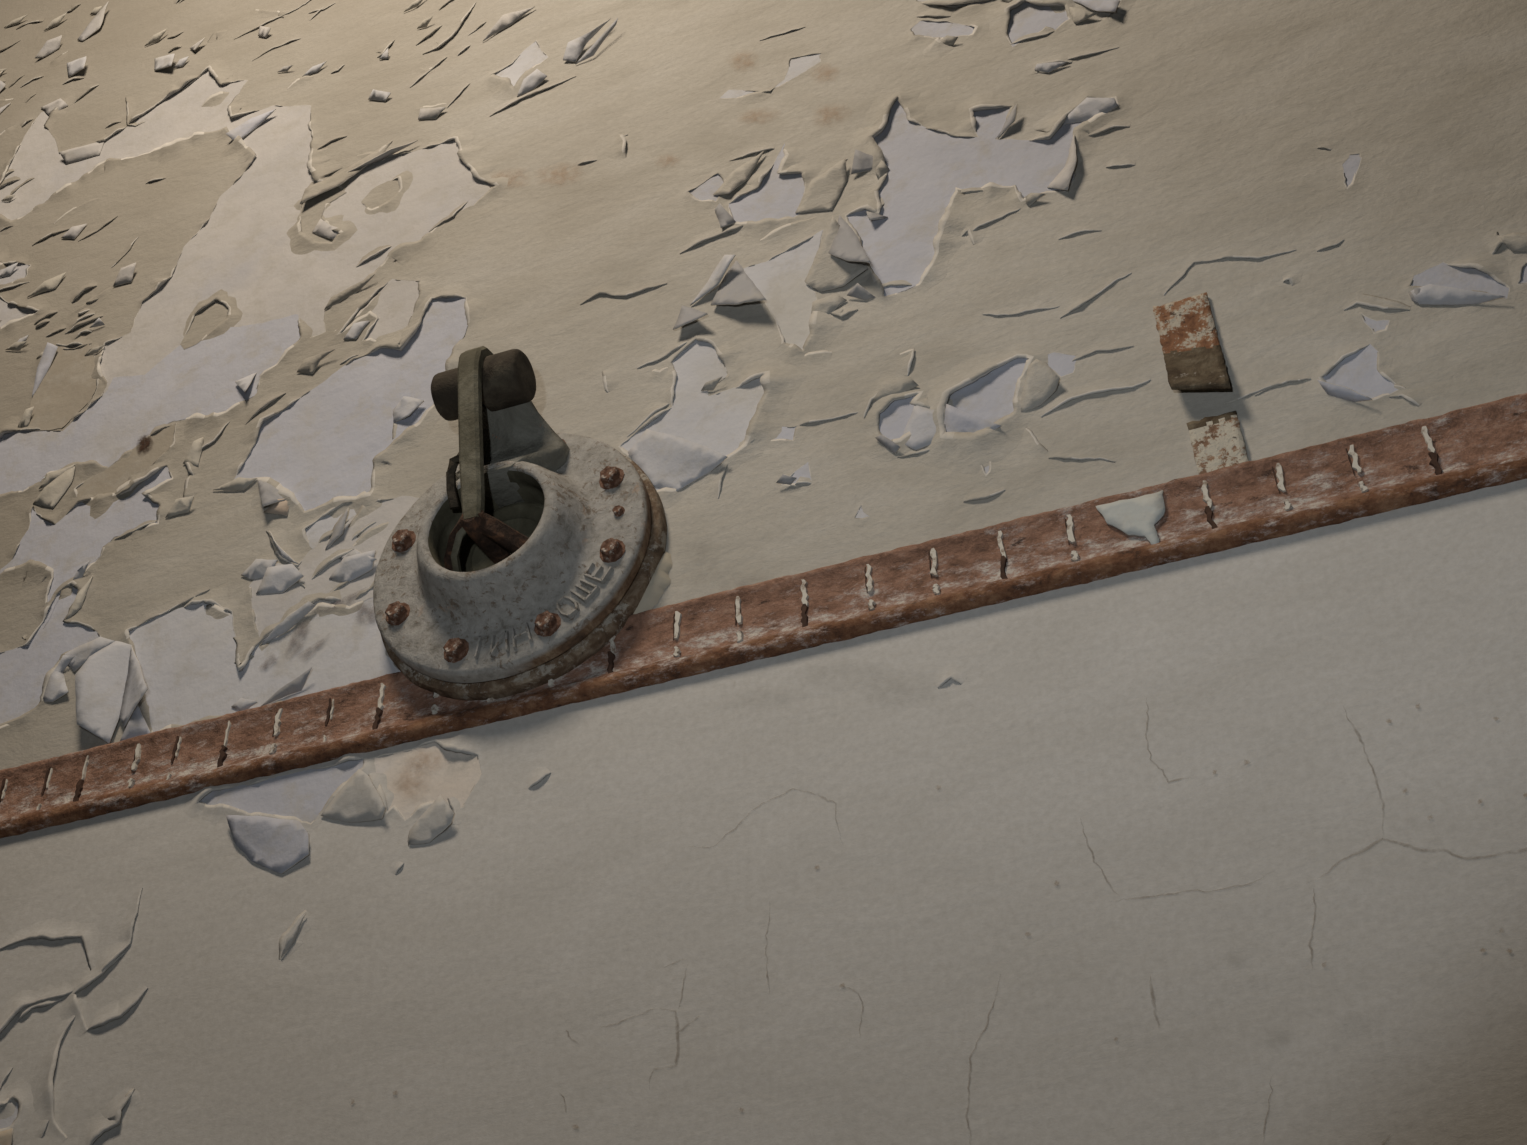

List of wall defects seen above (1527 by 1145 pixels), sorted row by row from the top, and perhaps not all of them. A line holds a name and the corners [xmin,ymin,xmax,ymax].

peeling [414,18,618,120]
peeling [903,0,1136,75]
peeling [0,0,535,744]
peeling [612,84,1151,508]
peeling [1254,228,1527,413]
corrosion [0,393,1527,839]
peeling [183,728,489,875]
peeling [0,1066,35,1145]